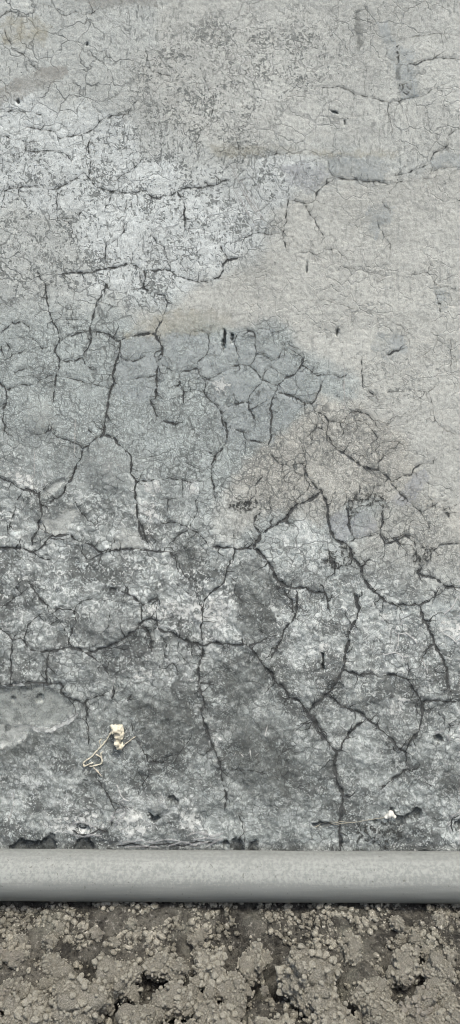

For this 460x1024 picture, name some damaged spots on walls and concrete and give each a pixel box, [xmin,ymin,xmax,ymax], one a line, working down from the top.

crack [4,6,98,68]
crack [391,33,459,66]
crack [322,69,432,132]
crack [0,79,460,851]